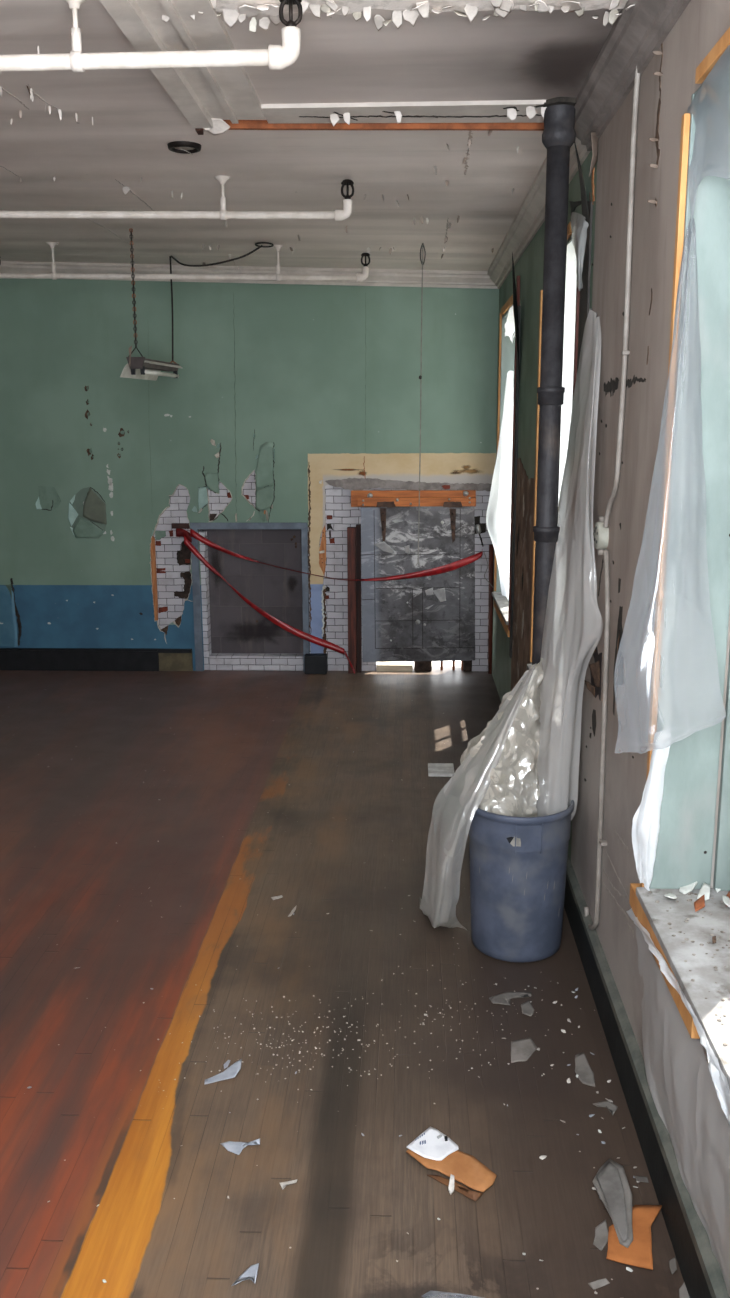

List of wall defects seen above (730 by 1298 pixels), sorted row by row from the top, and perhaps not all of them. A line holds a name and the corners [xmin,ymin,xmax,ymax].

peeling [190,0,634,33]
crack [203,118,230,135]
crack [299,102,548,186]
peeling [35,385,129,541]
spalling [140,429,275,644]